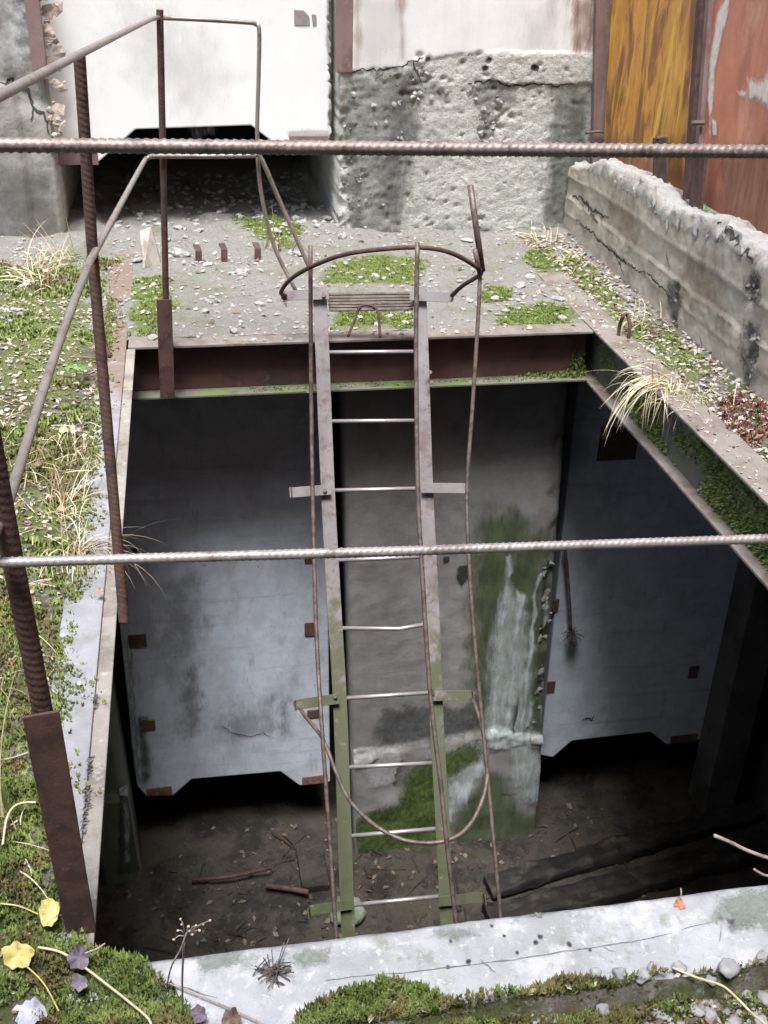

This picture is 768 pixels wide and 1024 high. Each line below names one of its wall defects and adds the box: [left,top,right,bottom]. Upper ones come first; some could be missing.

spalling [40,0,68,138]
crack [352,57,423,85]
spalling [343,64,449,141]
spalling [466,83,512,142]
crack [468,79,574,88]
spalling [342,155,403,231]
crack [572,195,671,298]
spalling [740,323,761,383]
water stain [443,555,548,803]
water stain [365,706,431,788]